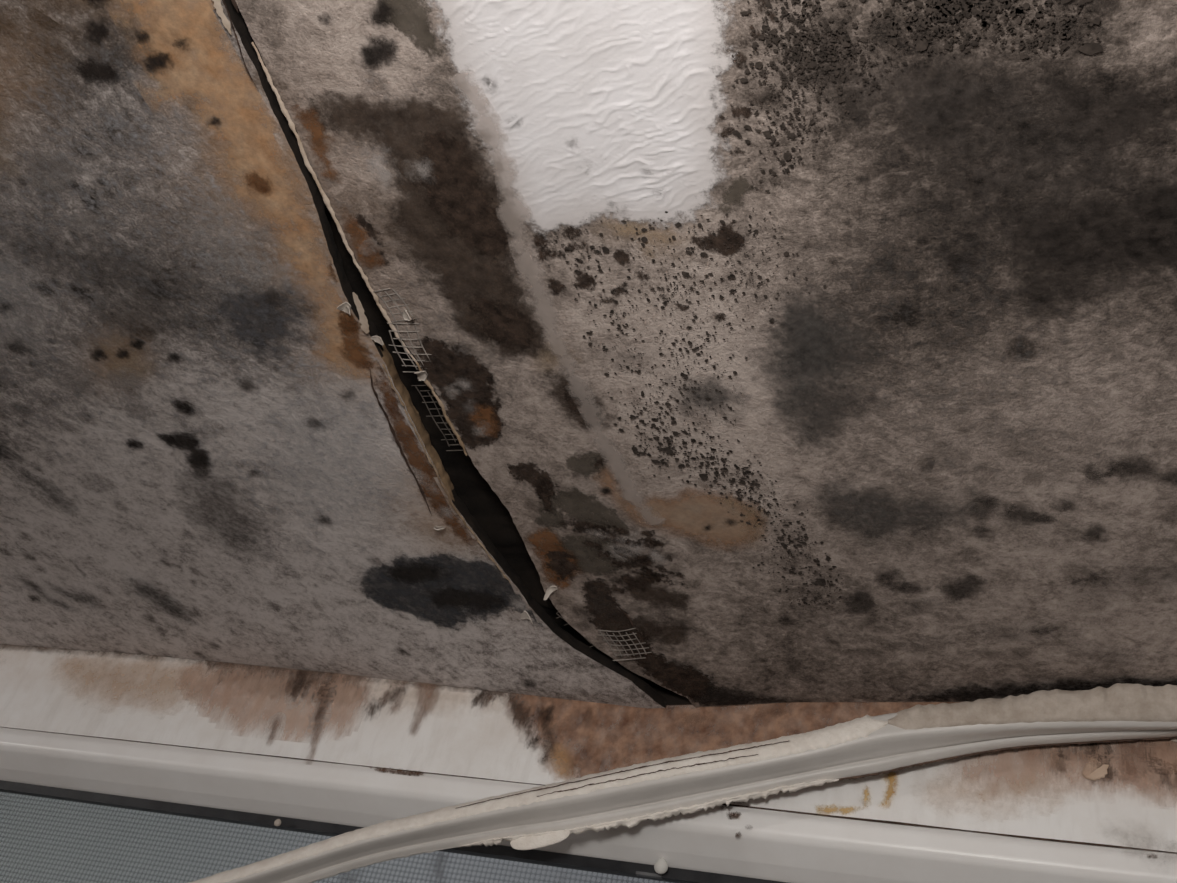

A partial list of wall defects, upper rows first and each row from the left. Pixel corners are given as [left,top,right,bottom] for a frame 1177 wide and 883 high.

damp [361,0,446,68]
damp [115,0,372,378]
damp [307,93,544,357]
crack [212,0,692,708]
damp [416,336,505,450]
damp [507,0,1177,706]
damp [157,432,209,476]
damp [360,553,541,630]
damp [84,659,504,753]
damp [376,768,423,776]
damp [963,739,1177,789]
peeling [1082,757,1109,781]